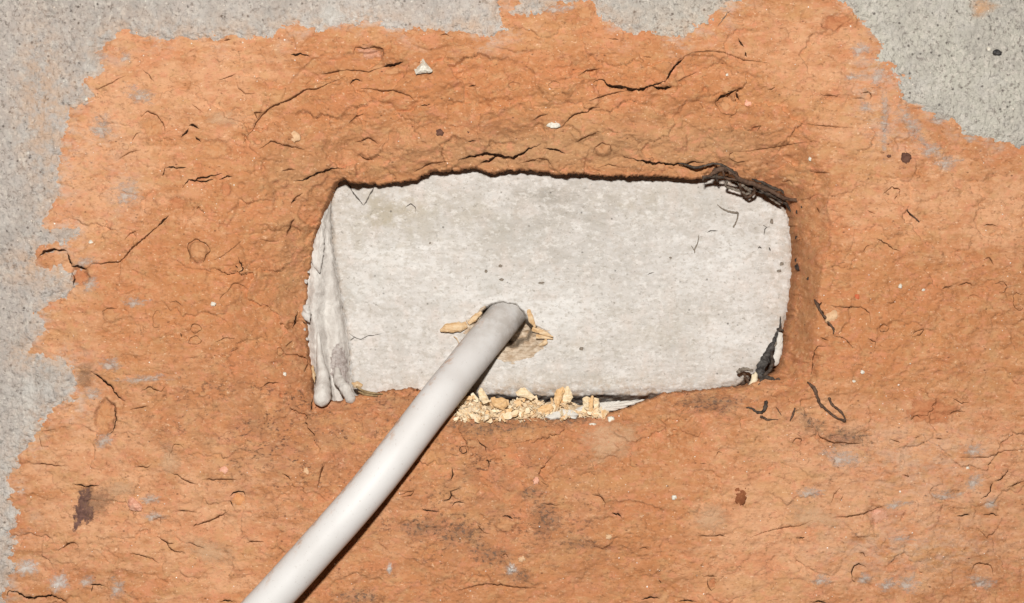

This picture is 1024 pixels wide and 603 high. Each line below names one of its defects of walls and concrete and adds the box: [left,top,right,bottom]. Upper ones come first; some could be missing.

crack [414,11,767,172]
crack [40,216,168,285]
crack [187,46,429,303]
peeling [311,225,325,273]